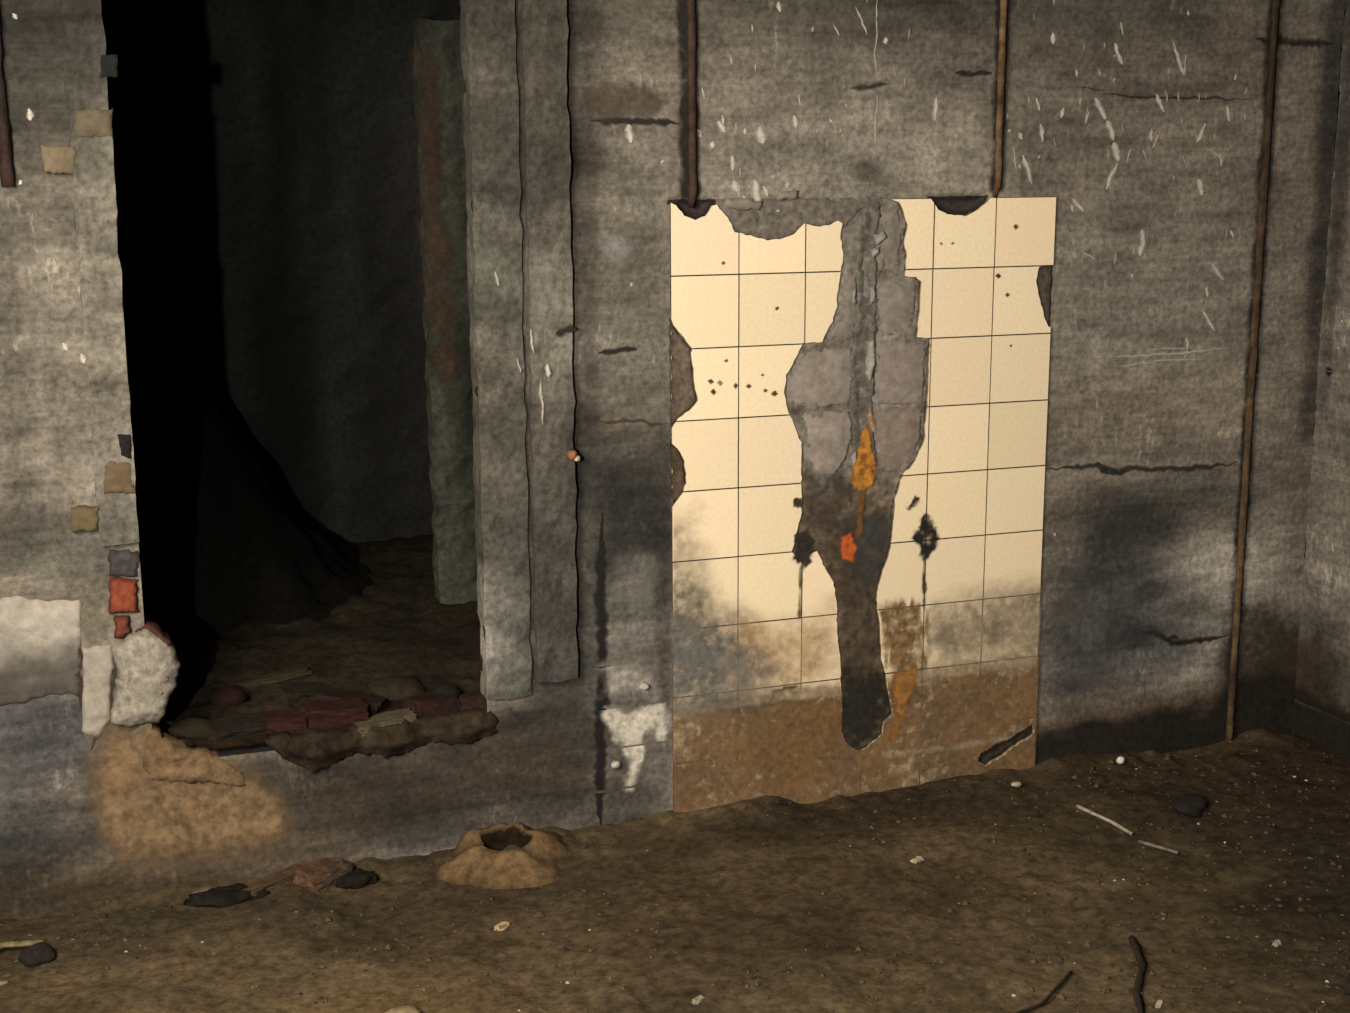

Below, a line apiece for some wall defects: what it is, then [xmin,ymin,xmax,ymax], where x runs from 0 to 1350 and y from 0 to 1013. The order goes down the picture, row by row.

crack [1256,36,1333,47]
peeling [698,115,766,149]
peeling [0,549,172,738]
spalling [117,434,132,459]
spalling [667,156,929,750]
rust [841,414,877,561]
damp [908,496,939,601]
damp [602,585,1350,812]
damp [1055,506,1169,668]
crack [1046,461,1237,475]